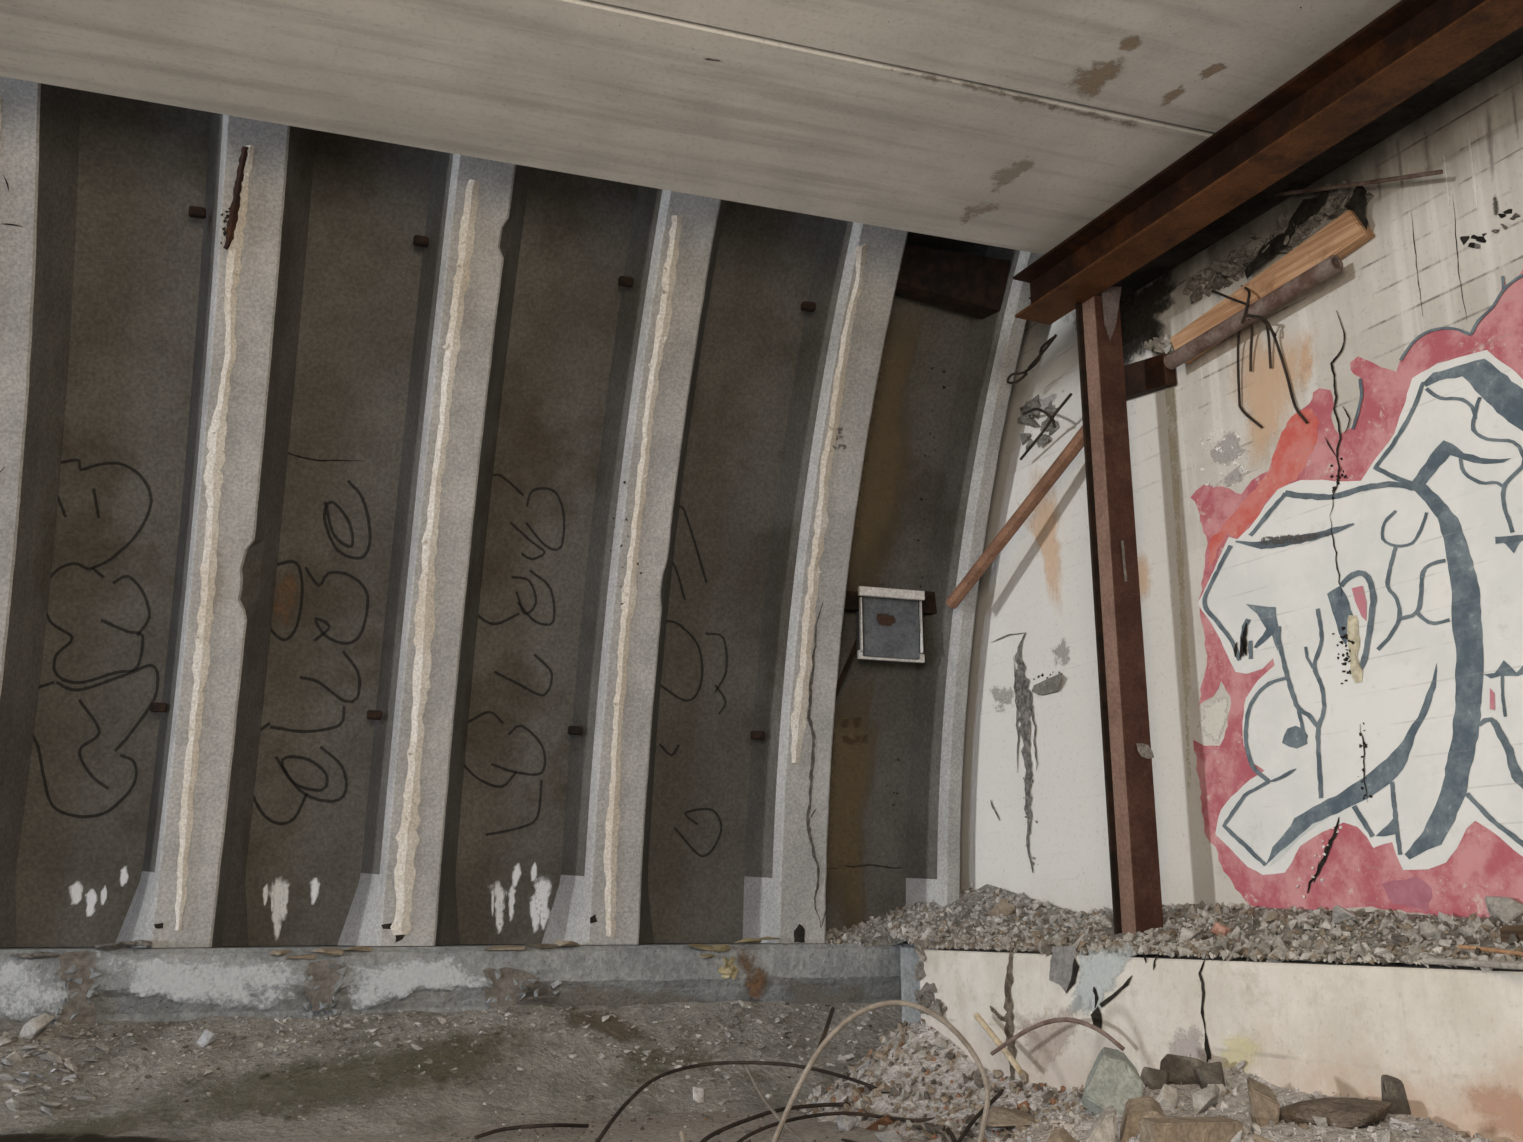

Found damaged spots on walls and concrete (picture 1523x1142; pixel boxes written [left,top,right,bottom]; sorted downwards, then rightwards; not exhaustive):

crack [1325,310,1355,684]
crack [806,603,900,928]
crack [1296,722,1373,898]
spalling [11,923,163,1025]
spalling [270,946,372,1019]
spalling [483,940,581,1010]
crack [1092,987,1100,1008]
crack [1198,955,1211,1063]
leakage [0,1133,193,1142]